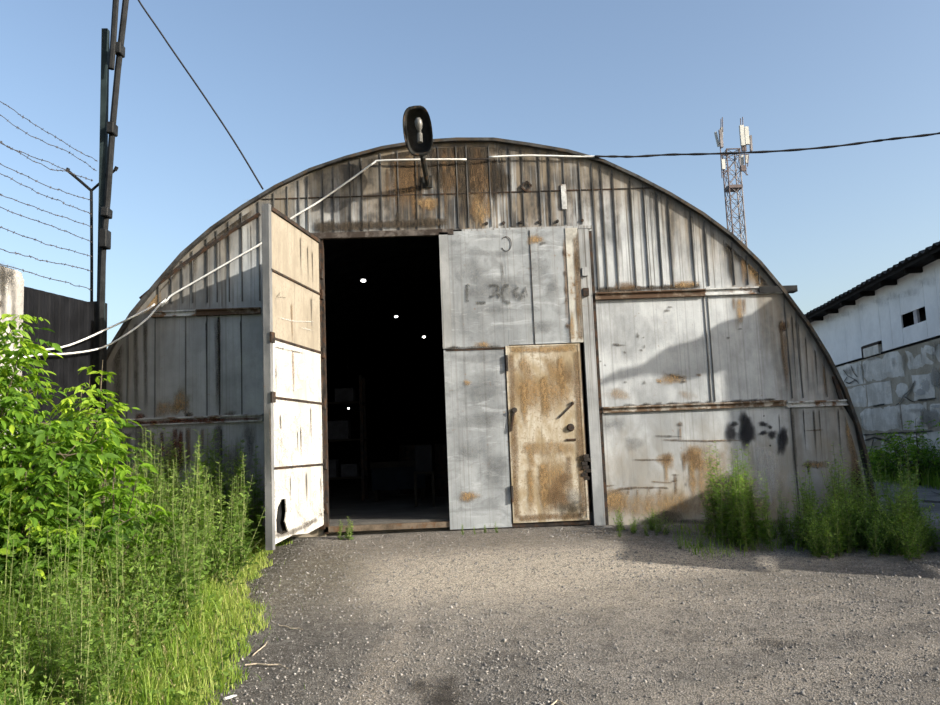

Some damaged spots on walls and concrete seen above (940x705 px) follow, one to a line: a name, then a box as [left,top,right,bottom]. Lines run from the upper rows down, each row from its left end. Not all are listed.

corrosion [386,147,509,222]
corrosion [509,234,586,521]
corrosion [136,391,257,472]
peeling [274,410,311,492]
peeling [297,492,324,519]
corrosion [606,422,737,520]